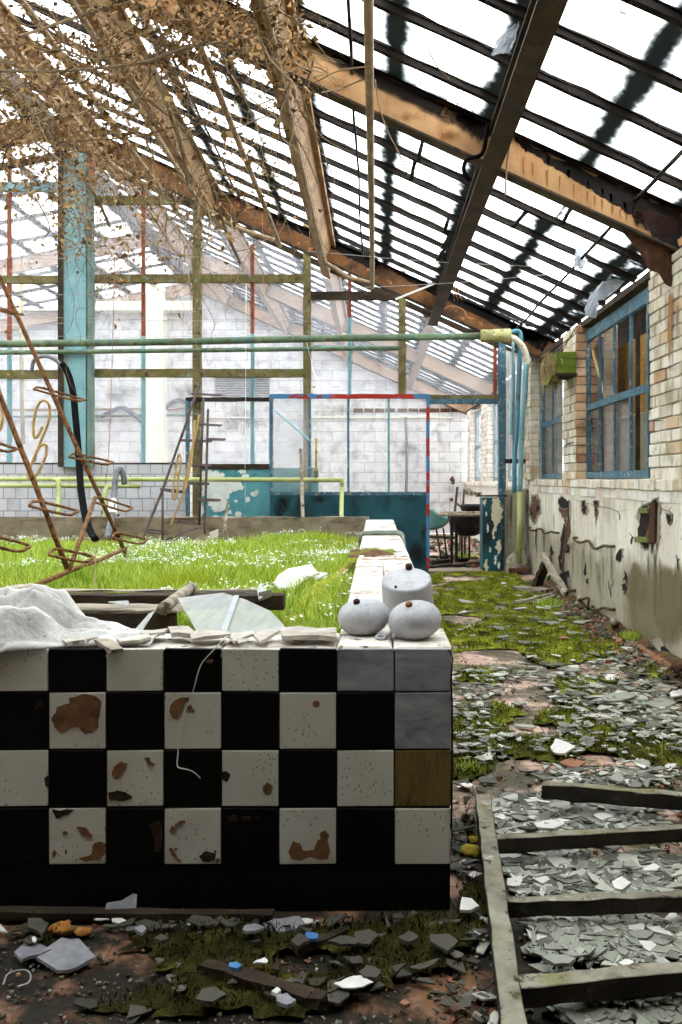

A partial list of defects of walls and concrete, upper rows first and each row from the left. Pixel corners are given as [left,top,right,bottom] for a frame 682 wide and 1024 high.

peeling [201,469,259,517]
peeling [449,476,504,571]
flaking render [529,493,542,525]
flaking render [548,495,599,589]
flaking render [636,497,673,551]